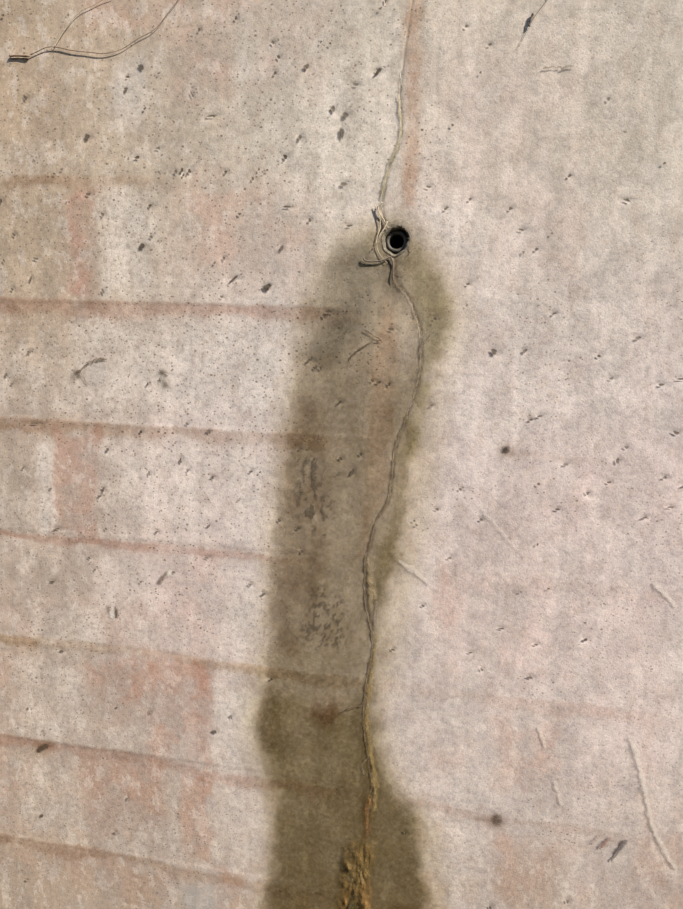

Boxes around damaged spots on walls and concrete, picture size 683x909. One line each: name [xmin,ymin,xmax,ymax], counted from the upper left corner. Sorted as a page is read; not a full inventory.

crack [381,70,403,222]
crack [338,258,434,834]
water stain [337,798,373,909]